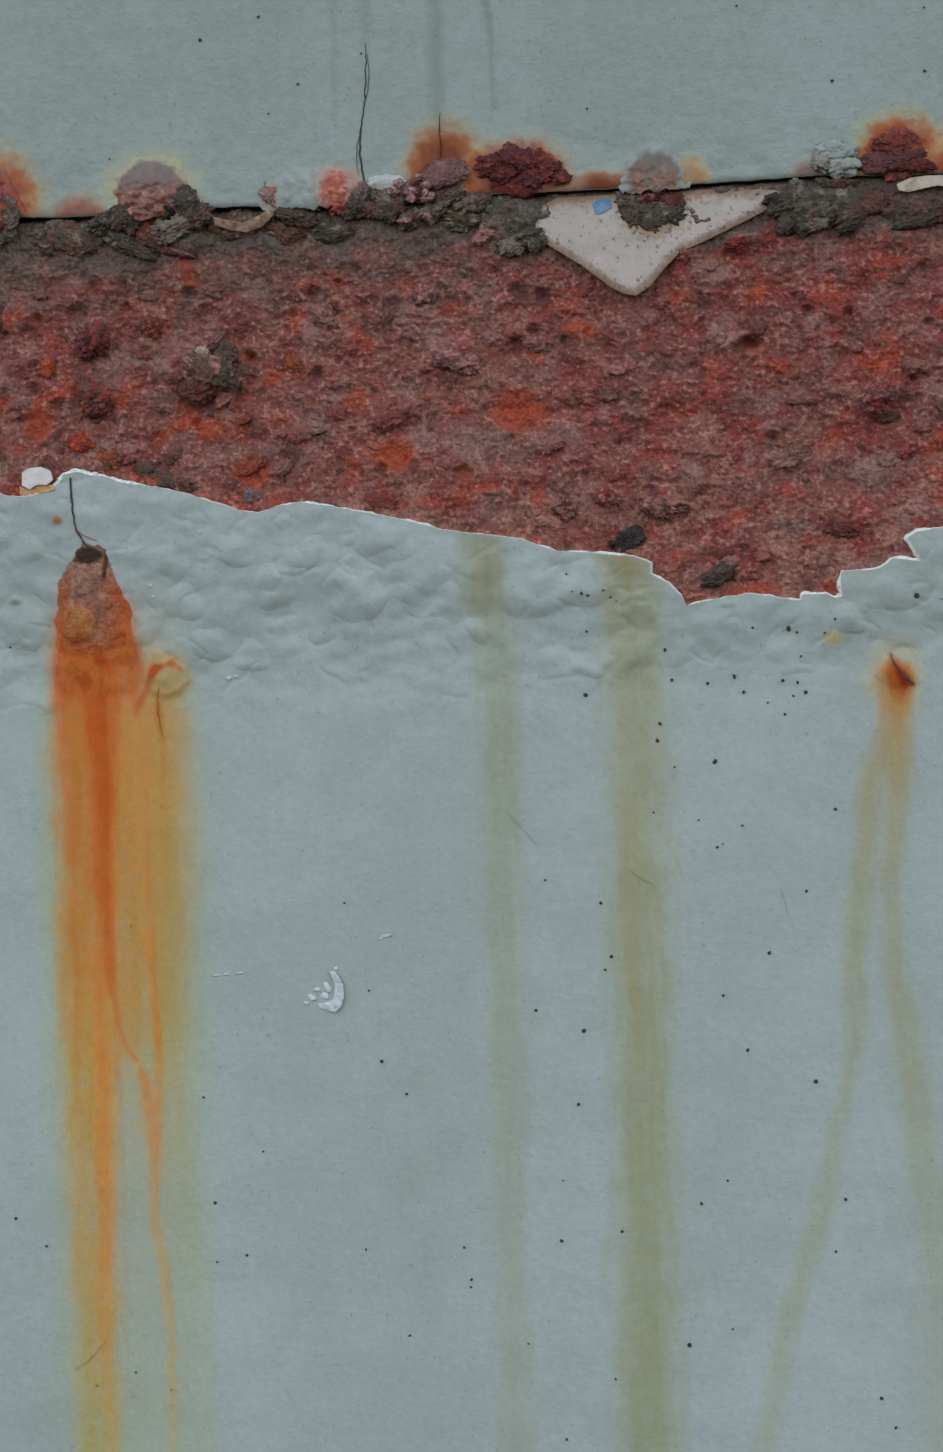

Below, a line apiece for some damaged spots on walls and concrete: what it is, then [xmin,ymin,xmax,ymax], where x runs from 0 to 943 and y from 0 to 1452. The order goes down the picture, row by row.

peeling [897,175,943,192]
peeling [213,209,274,233]
peeling [535,186,779,296]
corrosion [0,117,943,605]
peeling [19,467,55,496]
corrosion [872,647,921,699]
corrosion [54,543,187,1452]